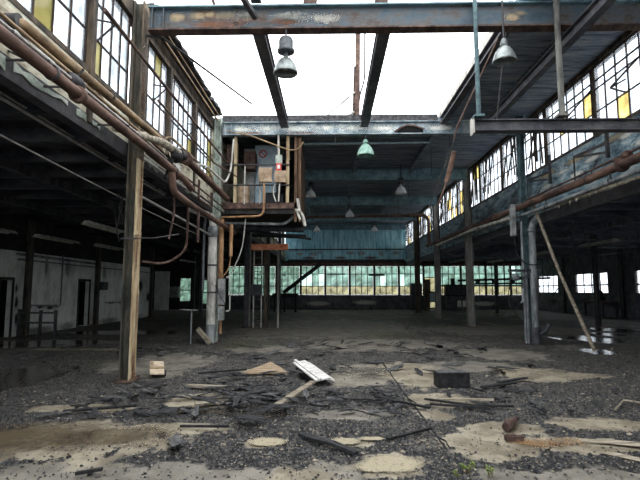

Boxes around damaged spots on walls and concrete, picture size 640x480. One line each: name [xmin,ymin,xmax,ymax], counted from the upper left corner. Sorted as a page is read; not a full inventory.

rust [170,12,296,28]
peeling [229,12,339,23]
peeling [0,53,68,106]